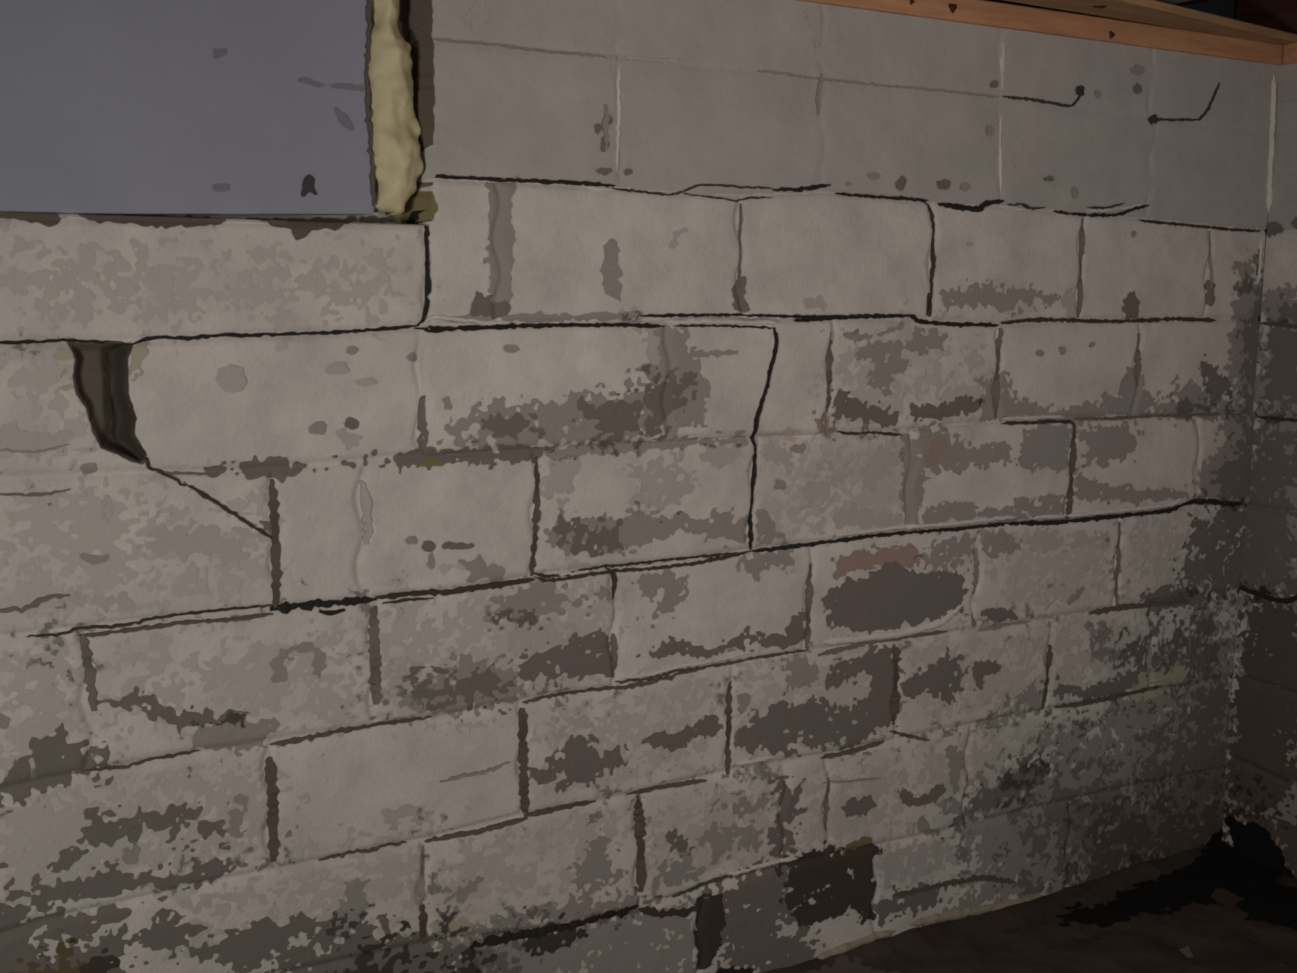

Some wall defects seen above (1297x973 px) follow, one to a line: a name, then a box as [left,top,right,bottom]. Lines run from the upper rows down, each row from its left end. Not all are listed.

crack [1152,82,1220,122]
damp [595,115,613,152]
damp [597,168,633,176]
damp [895,176,907,191]
damp [937,179,971,191]
damp [1267,217,1297,238]
damp [0,182,438,381]
crack [0,174,1261,638]
crack [1239,586,1297,604]